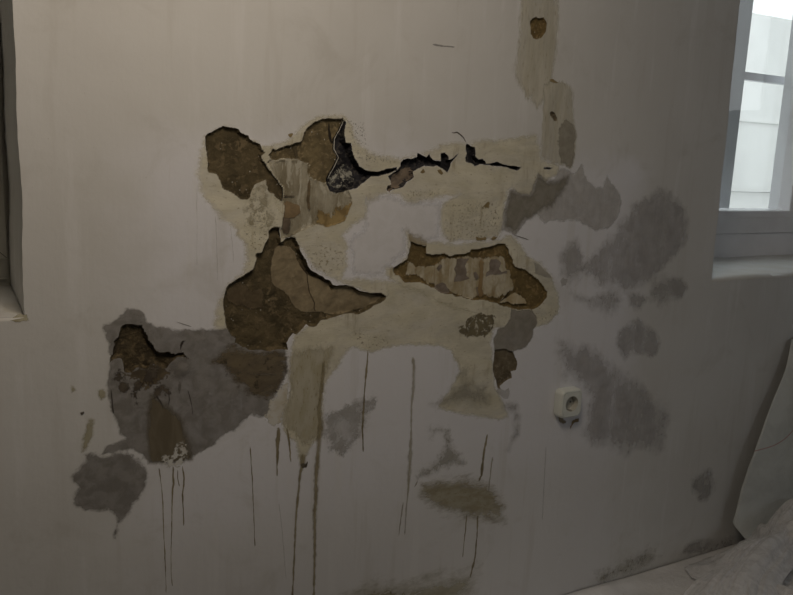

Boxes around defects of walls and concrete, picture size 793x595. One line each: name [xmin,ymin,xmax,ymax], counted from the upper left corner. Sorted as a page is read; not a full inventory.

spalling [530,17,547,39]
crack [326,120,521,193]
spalling [205,118,386,351]
spalling [393,236,551,310]
spalling [109,324,189,373]
spalling [493,349,517,389]
water stain [73,309,287,535]
peeling [264,383,288,427]
peeling [157,442,187,468]